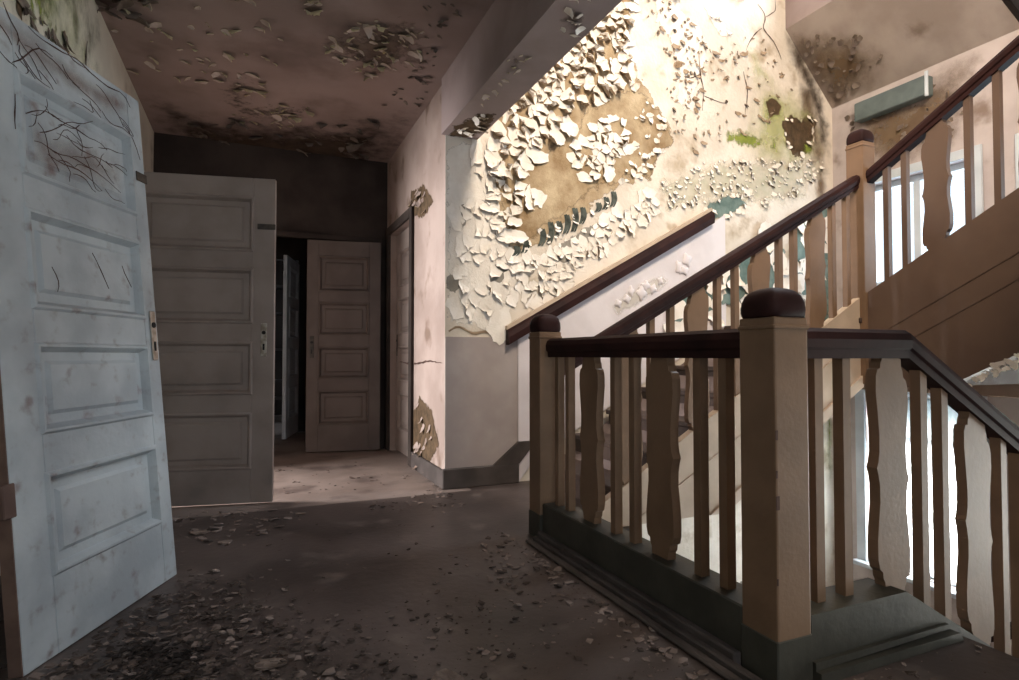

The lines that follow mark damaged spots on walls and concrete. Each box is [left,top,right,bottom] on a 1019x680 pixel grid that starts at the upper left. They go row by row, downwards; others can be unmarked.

peeling [16,0,75,54]
peeling [95,0,380,160]
peeling [323,3,461,107]
leakage [793,34,883,196]
peeling [408,184,433,218]
peeling [445,0,825,345]
spalling [968,353,1019,387]